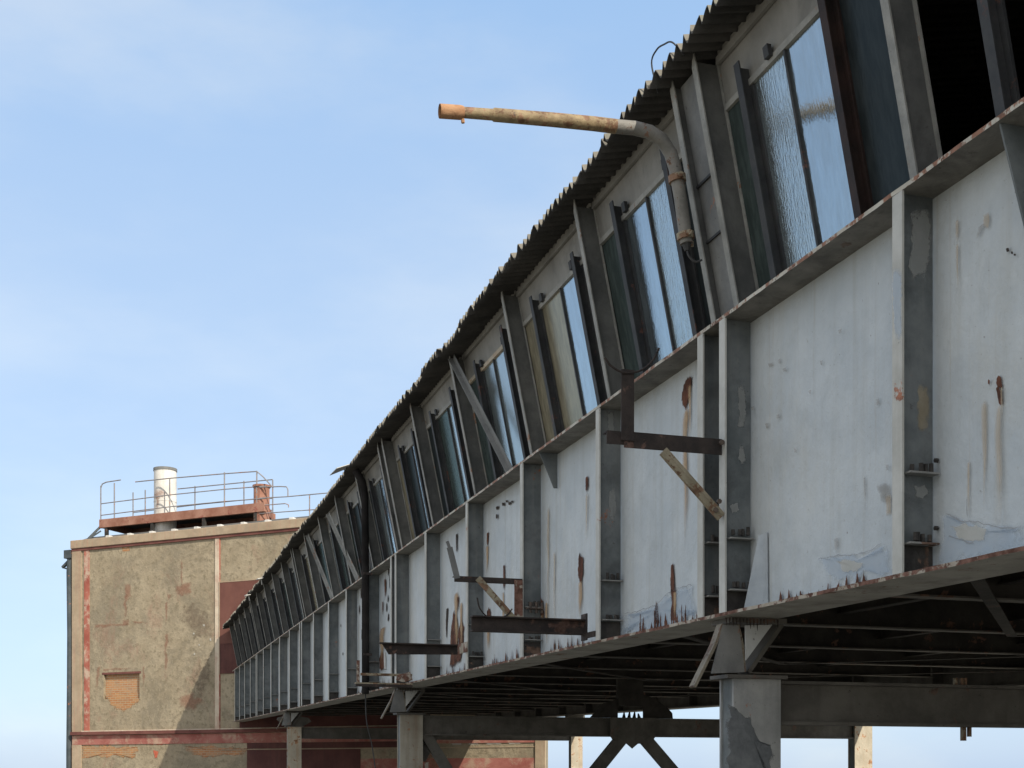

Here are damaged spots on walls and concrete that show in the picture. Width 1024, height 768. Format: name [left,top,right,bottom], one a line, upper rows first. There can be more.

rust [682,376,691,436]
rust [988,376,1003,482]
rust [639,564,697,631]
peeling [725,705,773,768]